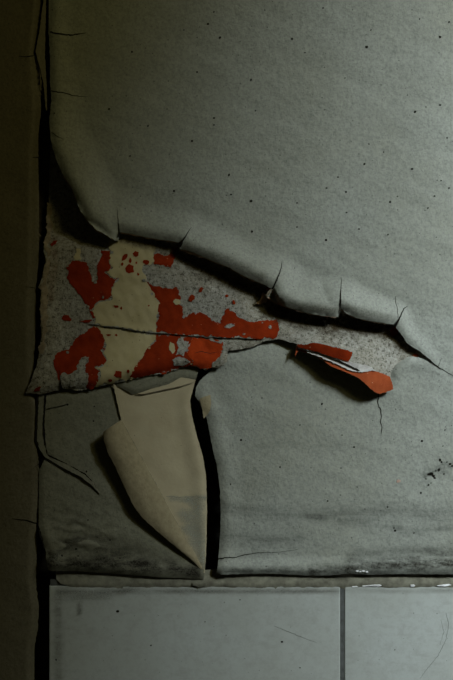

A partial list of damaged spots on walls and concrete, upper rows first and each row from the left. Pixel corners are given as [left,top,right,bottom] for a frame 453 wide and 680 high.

crack [88,324,261,354]
flaking render [26,0,449,569]
crack [35,370,98,492]
leakage [335,559,453,576]